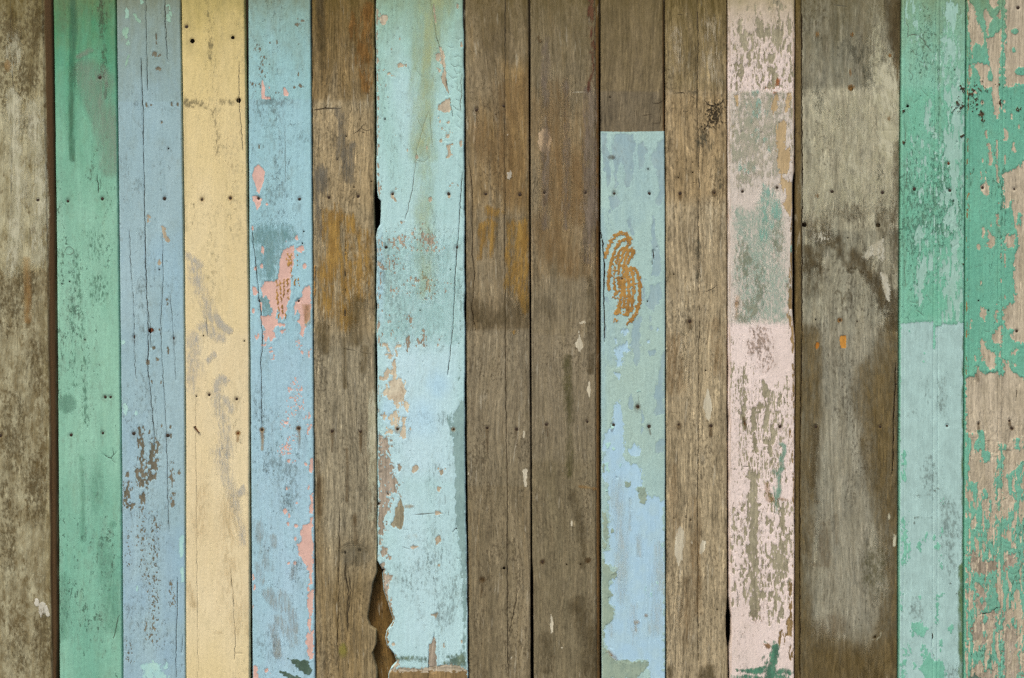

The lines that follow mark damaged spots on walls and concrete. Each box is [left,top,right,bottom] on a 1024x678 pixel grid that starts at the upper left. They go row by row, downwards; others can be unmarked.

peeling [252,164,268,210]
peeling [376,9,407,202]
peeling [407,47,462,159]
peeling [123,424,181,648]
peeling [252,235,312,360]
peeling [277,377,313,473]
peeling [283,486,314,660]
peeling [377,221,469,678]
peeling [729,0,794,660]
peeling [900,0,1024,678]